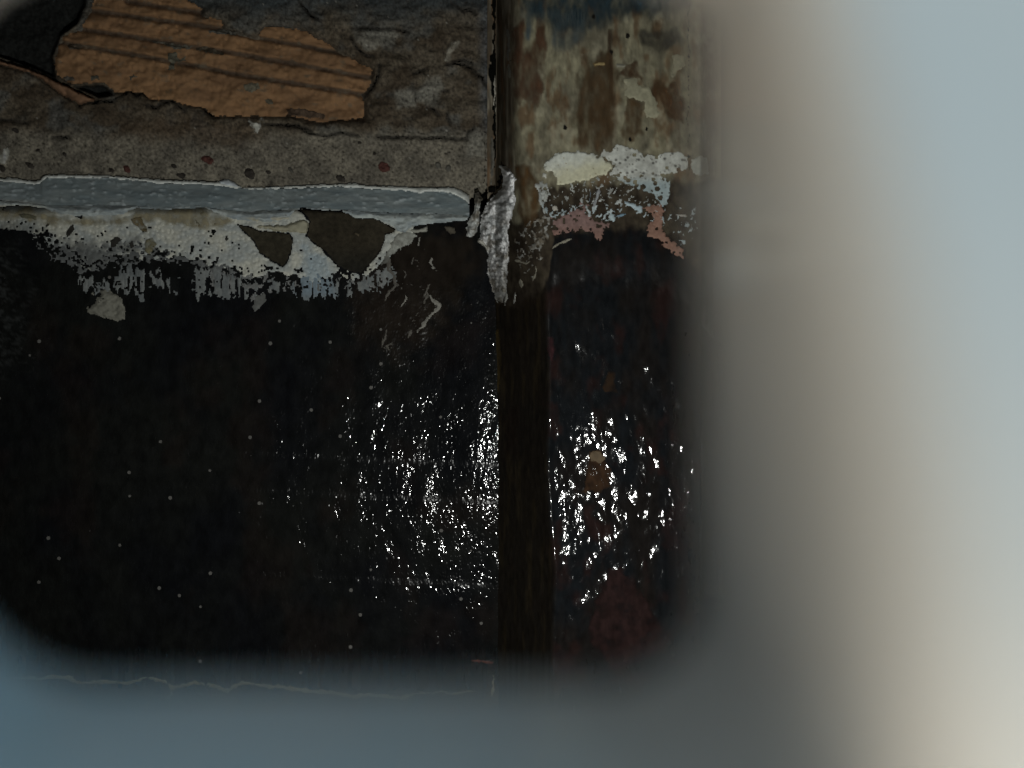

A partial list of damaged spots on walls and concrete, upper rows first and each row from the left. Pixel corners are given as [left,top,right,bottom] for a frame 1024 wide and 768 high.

water stain [526,0,683,49]
flaking render [0,0,487,311]
peeling [543,137,699,259]